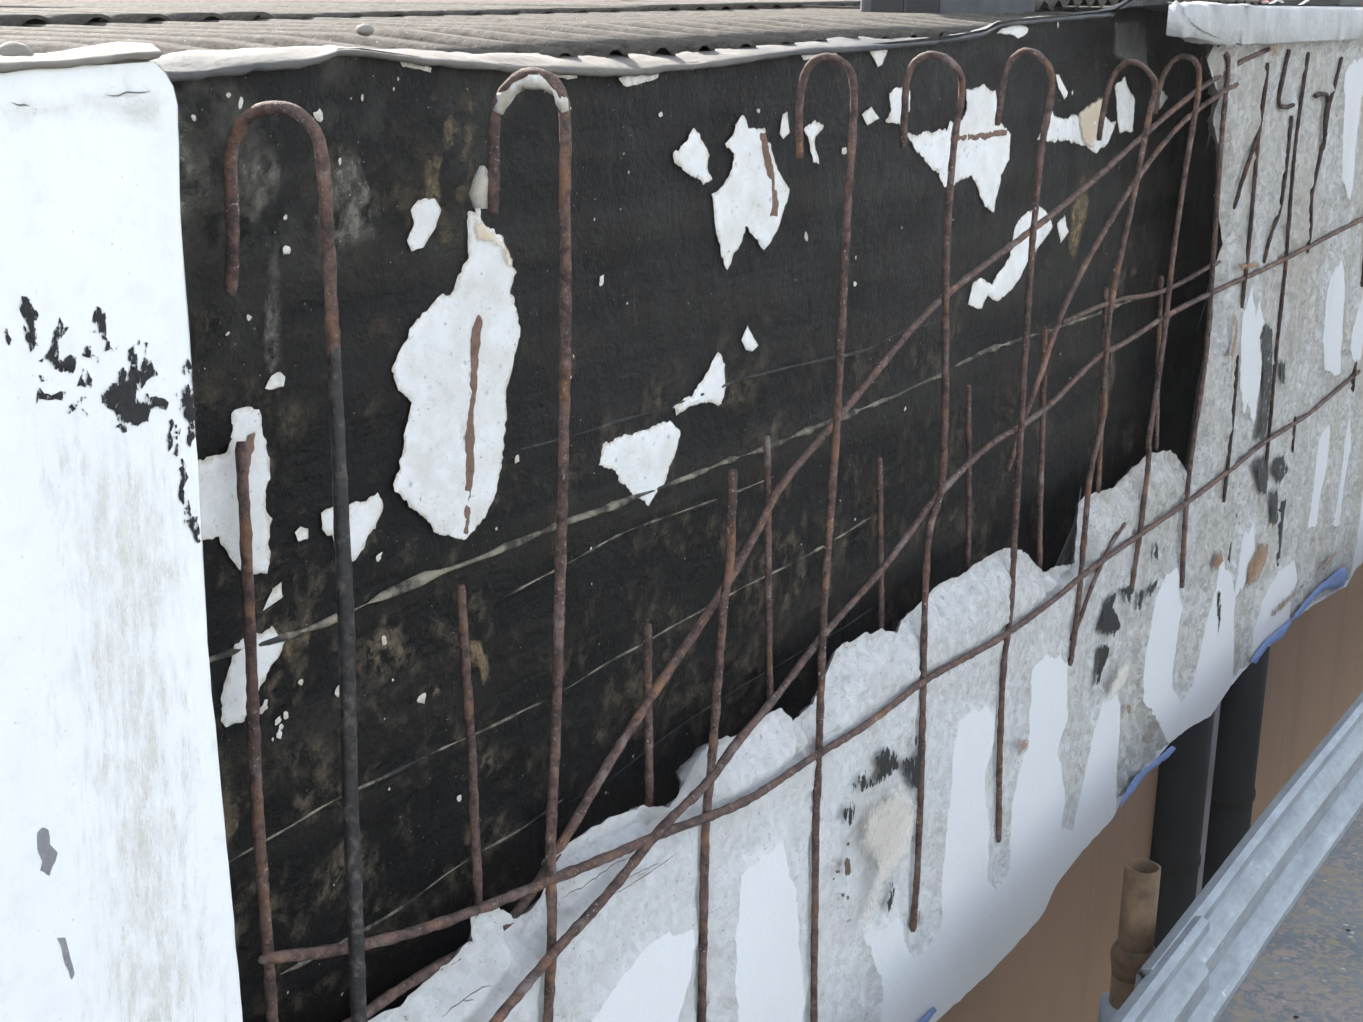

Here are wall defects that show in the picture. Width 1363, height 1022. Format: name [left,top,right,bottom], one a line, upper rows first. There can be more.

spalling [997,25,1028,39]
damp [178,111,209,224]
damp [320,157,378,247]
damp [425,96,472,241]
spalling [37,306,285,611]
spalling [295,507,334,541]
corrosion [223,46,1363,1022]
spalling [349,39,1363,1022]
spalling [221,626,285,727]
damp [469,641,488,680]
damp [221,781,238,842]
damp [862,786,917,930]